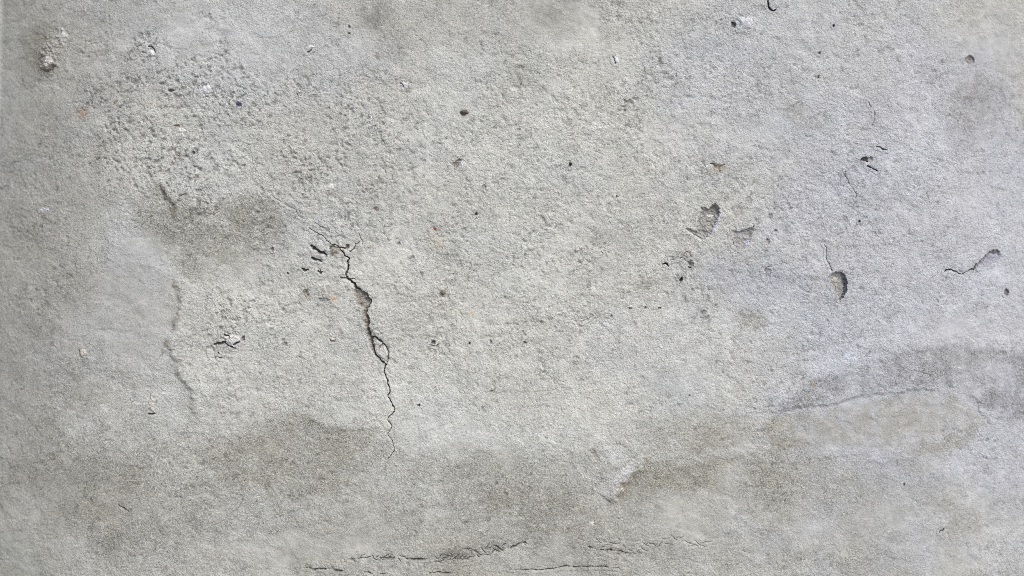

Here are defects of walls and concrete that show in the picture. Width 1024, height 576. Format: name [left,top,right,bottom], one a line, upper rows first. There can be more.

hole [821,241,851,304]
crack [942,246,1004,277]
crack [268,191,399,463]